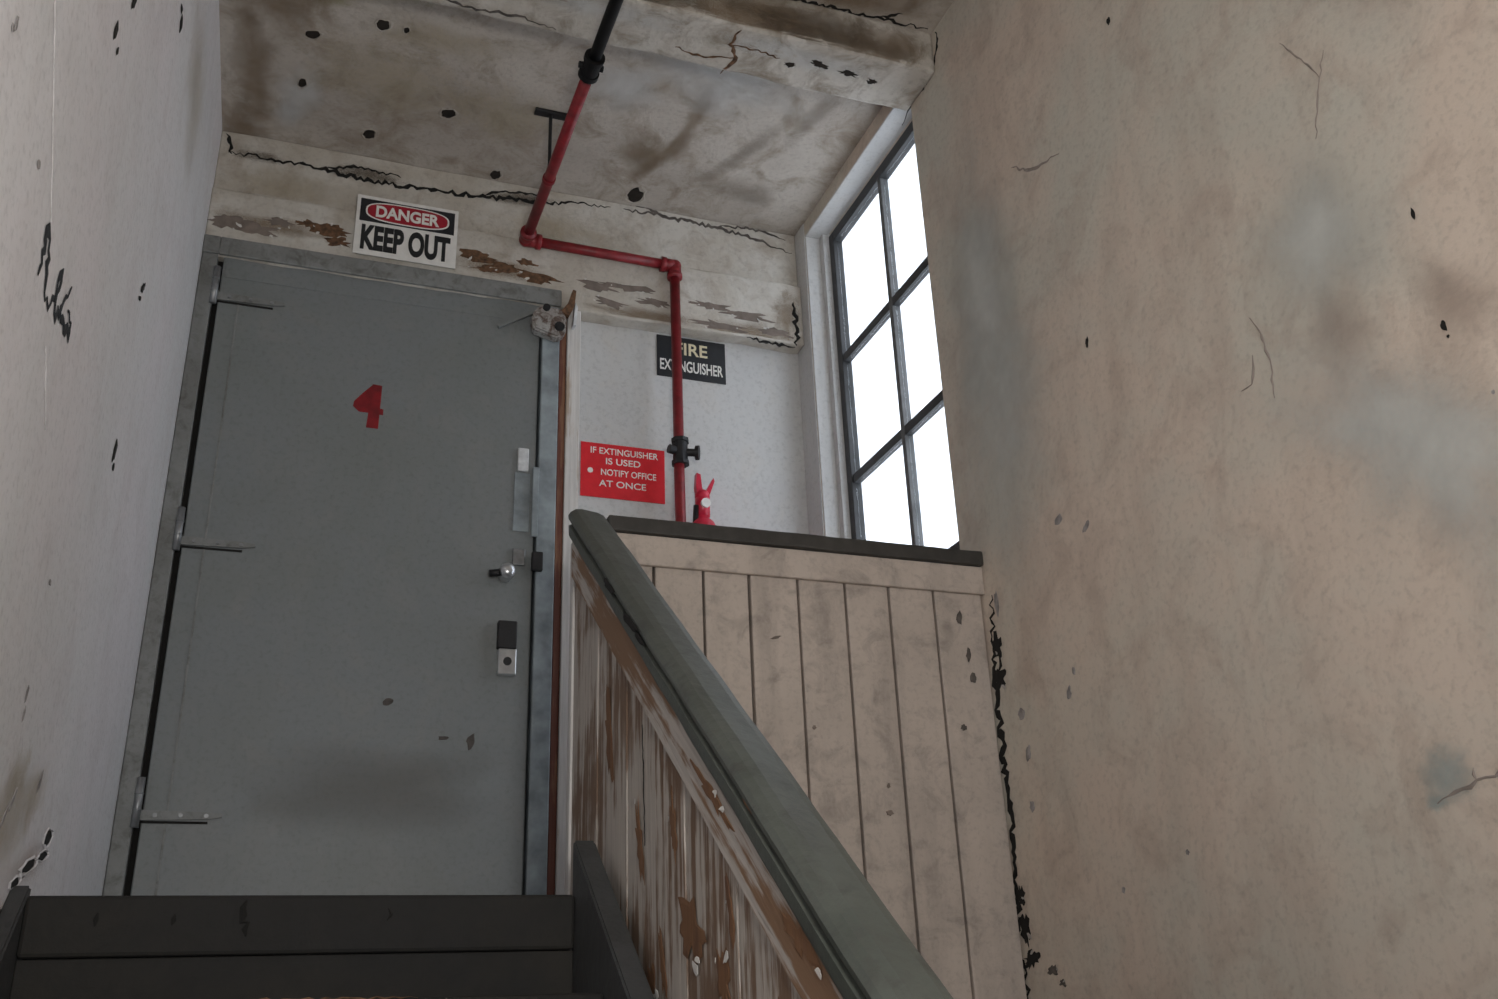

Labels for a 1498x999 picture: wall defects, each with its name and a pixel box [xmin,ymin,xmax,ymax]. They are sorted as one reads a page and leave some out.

damp [225,0,586,206]
damp [536,0,938,211]
crack [226,133,792,254]
peeling [459,248,670,310]
peeling [688,300,794,339]
spalling [966,648,976,683]
peeling [993,592,1006,690]
peeling [634,799,645,885]
peeling [690,758,735,832]
crack [1437,768,1498,804]
peeling [678,873,735,999]
peeling [1017,886,1067,987]